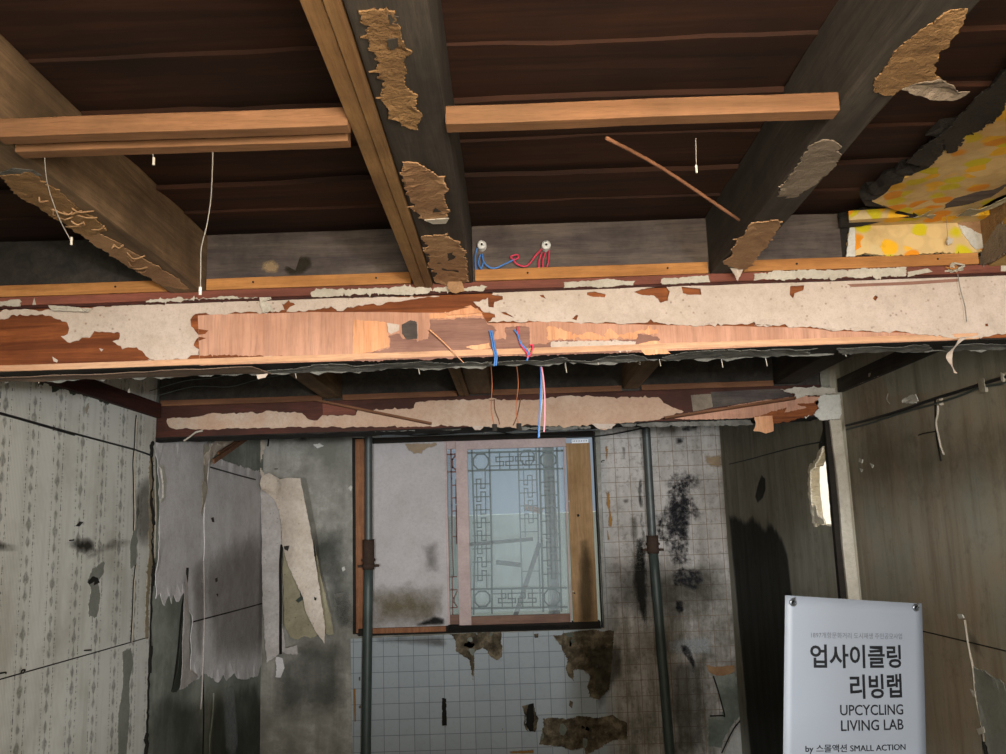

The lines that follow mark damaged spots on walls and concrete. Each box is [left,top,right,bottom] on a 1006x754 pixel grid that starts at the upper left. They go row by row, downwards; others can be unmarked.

peeling [38,197,105,231]
peeling [111,244,148,274]
peeling [259,297,273,313]
peeling [0,338,1006,405]
mould [657,475,702,589]
mould [634,532,647,620]
spalling [450,632,502,679]
spalling [553,629,614,699]
spalling [522,701,628,754]
peeling [970,666,1006,754]